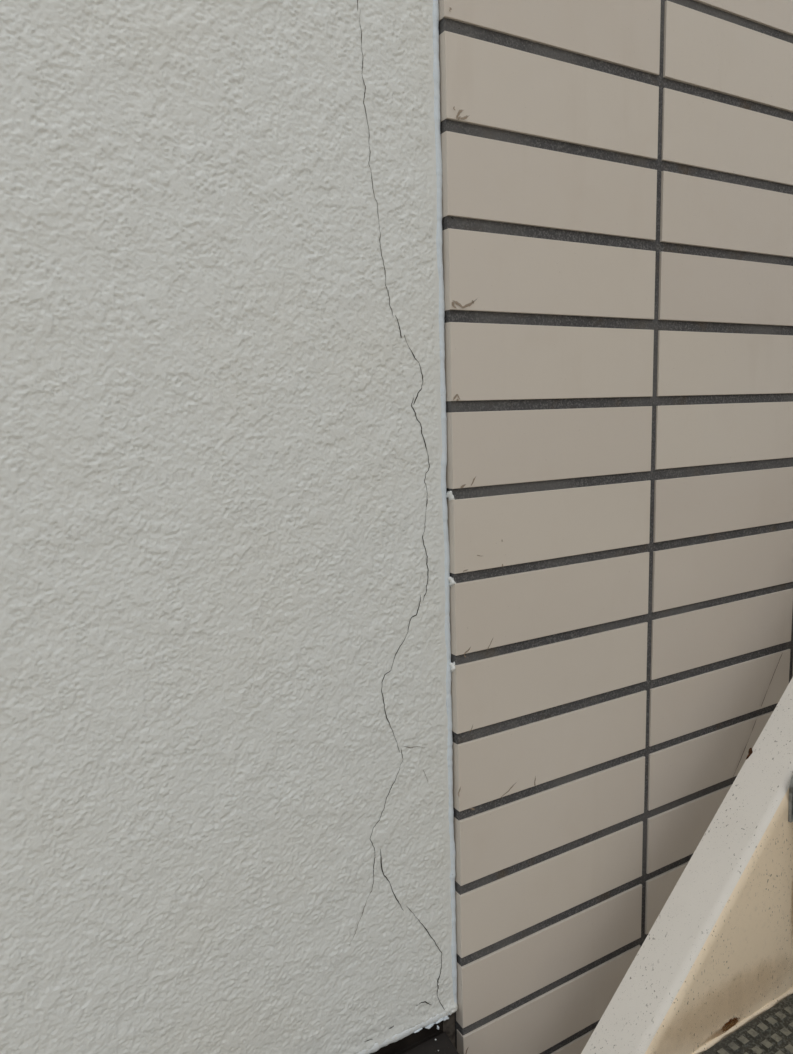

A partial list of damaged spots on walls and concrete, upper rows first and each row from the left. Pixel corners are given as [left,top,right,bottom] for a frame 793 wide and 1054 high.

crack [350,0,445,1010]